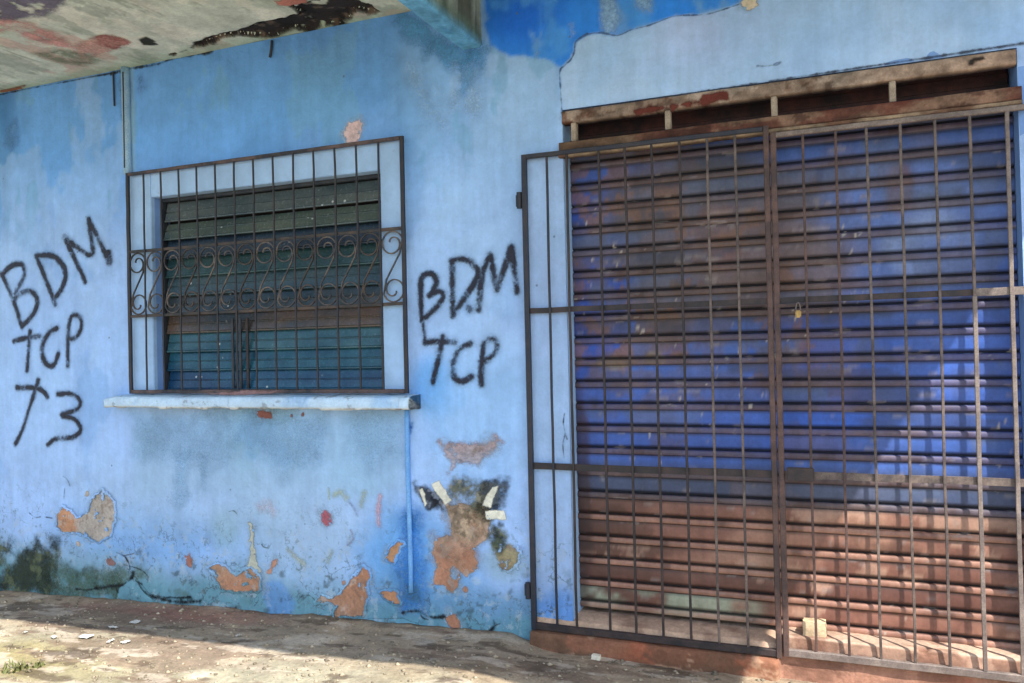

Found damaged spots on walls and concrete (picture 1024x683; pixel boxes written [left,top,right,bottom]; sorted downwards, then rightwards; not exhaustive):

spalling [191,0,380,48]
rust [633,91,729,116]
peeling [341,119,364,147]
peeling [438,435,501,471]
peeling [55,488,117,546]
peeling [320,510,332,526]
damp [0,539,139,599]
crack [76,554,201,604]
peeling [205,557,278,594]
peeling [313,563,403,619]
peeling [384,539,406,565]
peeling [432,503,490,594]